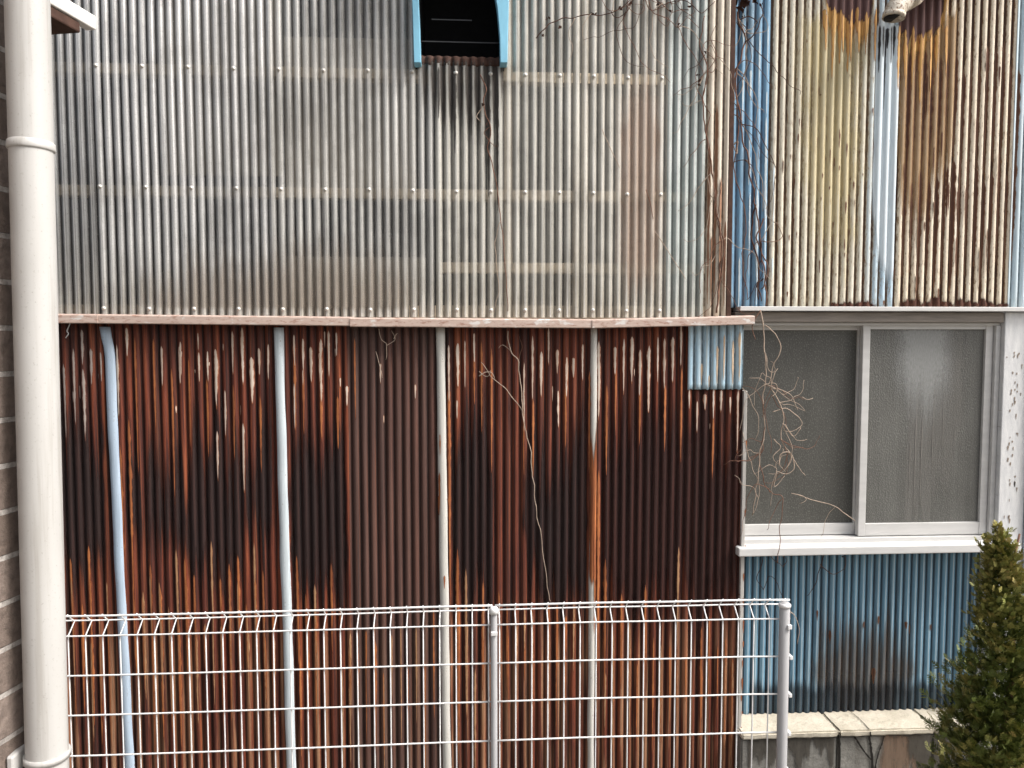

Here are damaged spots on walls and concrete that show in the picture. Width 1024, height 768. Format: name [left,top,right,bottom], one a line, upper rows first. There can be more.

rust [822,0,877,76]
rust [815,116,874,257]
rust [894,0,1021,307]
rust [831,277,884,307]
rust [59,323,747,768]
water stain [750,614,956,715]